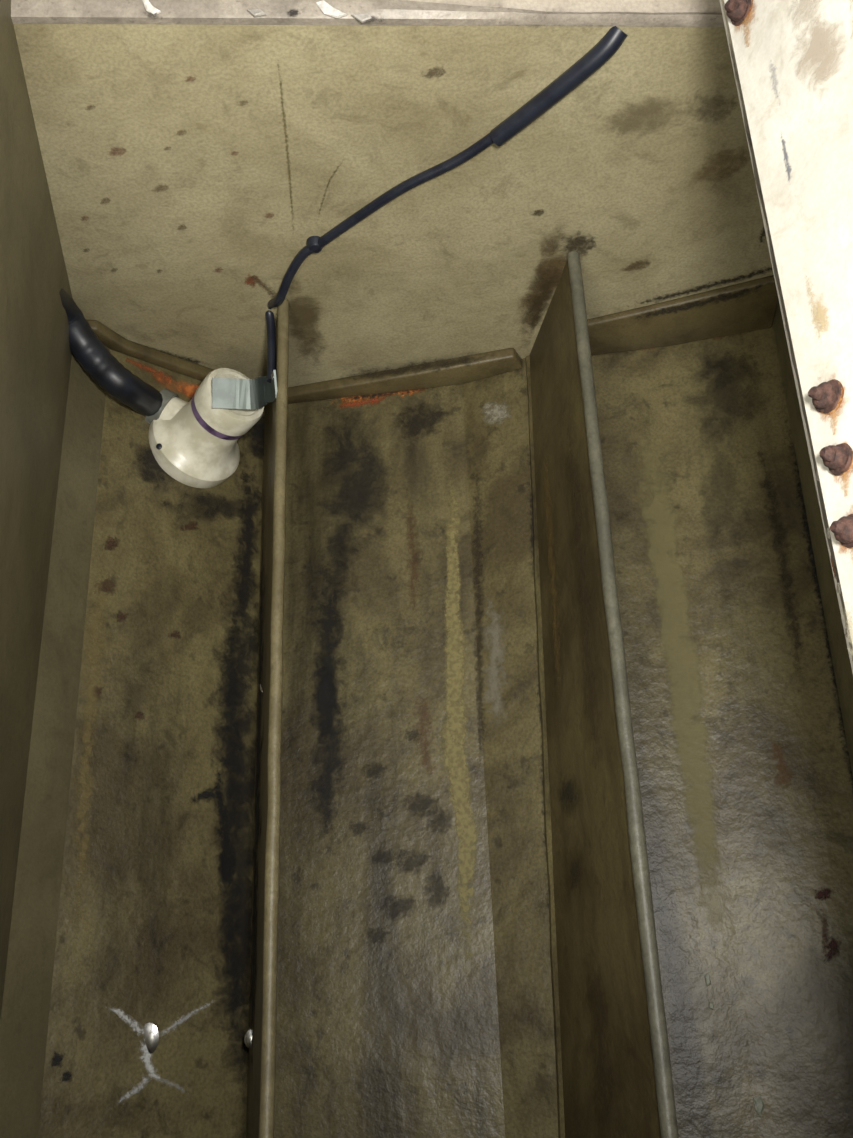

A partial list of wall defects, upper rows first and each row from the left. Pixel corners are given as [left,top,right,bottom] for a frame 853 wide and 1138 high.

leakage [138,449,165,482]
leakage [247,415,265,458]
leakage [330,430,383,567]
leakage [353,356,478,380]
leakage [401,404,448,435]
leakage [484,404,507,422]
leakage [165,476,264,1066]
leakage [312,591,341,828]
leakage [441,491,476,937]
leakage [642,451,716,868]
leakage [794,460,853,785]